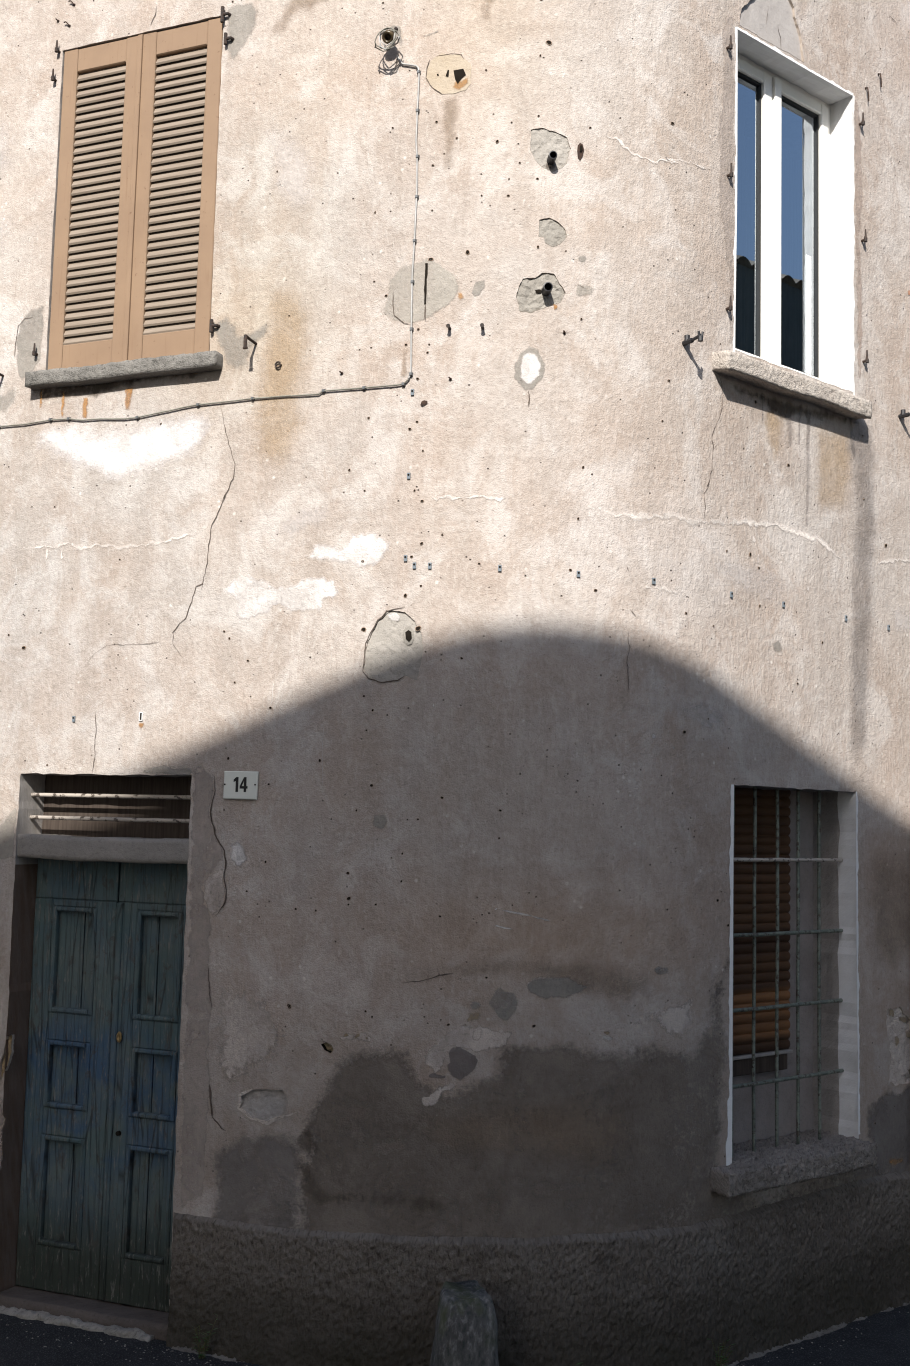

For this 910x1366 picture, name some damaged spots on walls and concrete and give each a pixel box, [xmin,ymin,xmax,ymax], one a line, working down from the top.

peeling [739,0,804,62]
rust [40,377,158,417]
crack [100,405,235,658]
crack [210,776,227,913]
water stain [213,967,910,1239]
flaking render [886,1007,910,1086]